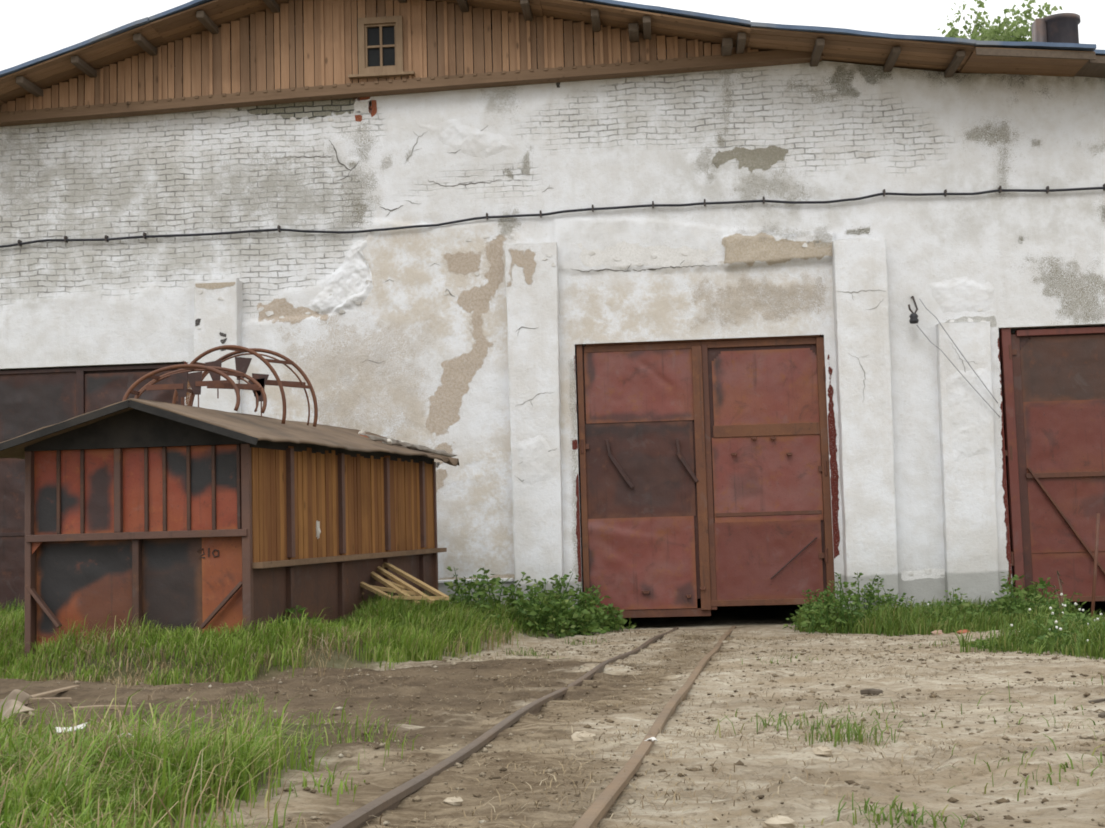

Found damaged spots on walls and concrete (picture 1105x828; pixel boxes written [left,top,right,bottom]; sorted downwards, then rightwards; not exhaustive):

crack [381,180,497,214]
spalling [576,232,833,338]
leakage [1008,231,1105,325]
flaking render [257,233,556,494]